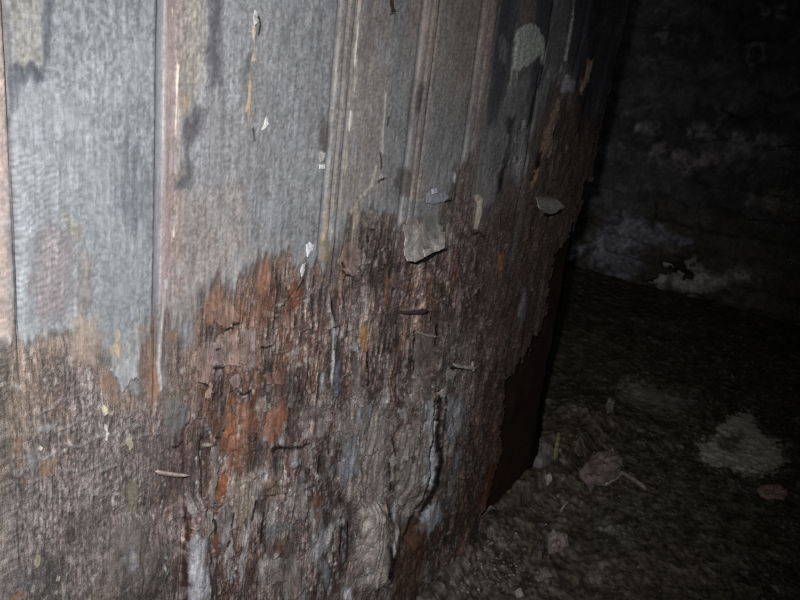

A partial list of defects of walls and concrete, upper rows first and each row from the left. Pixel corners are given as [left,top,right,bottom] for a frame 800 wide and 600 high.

peeling [175,63,188,137]
peeling [284,199,333,290]
peeling [401,217,447,280]
peeling [473,194,483,236]
peeling [536,198,565,216]
peeling [110,330,140,392]
peeling [191,300,259,399]
peeling [304,410,333,440]
crack [415,395,447,525]
peeling [206,446,233,552]
peeling [267,558,302,600]
crack [387,544,395,579]